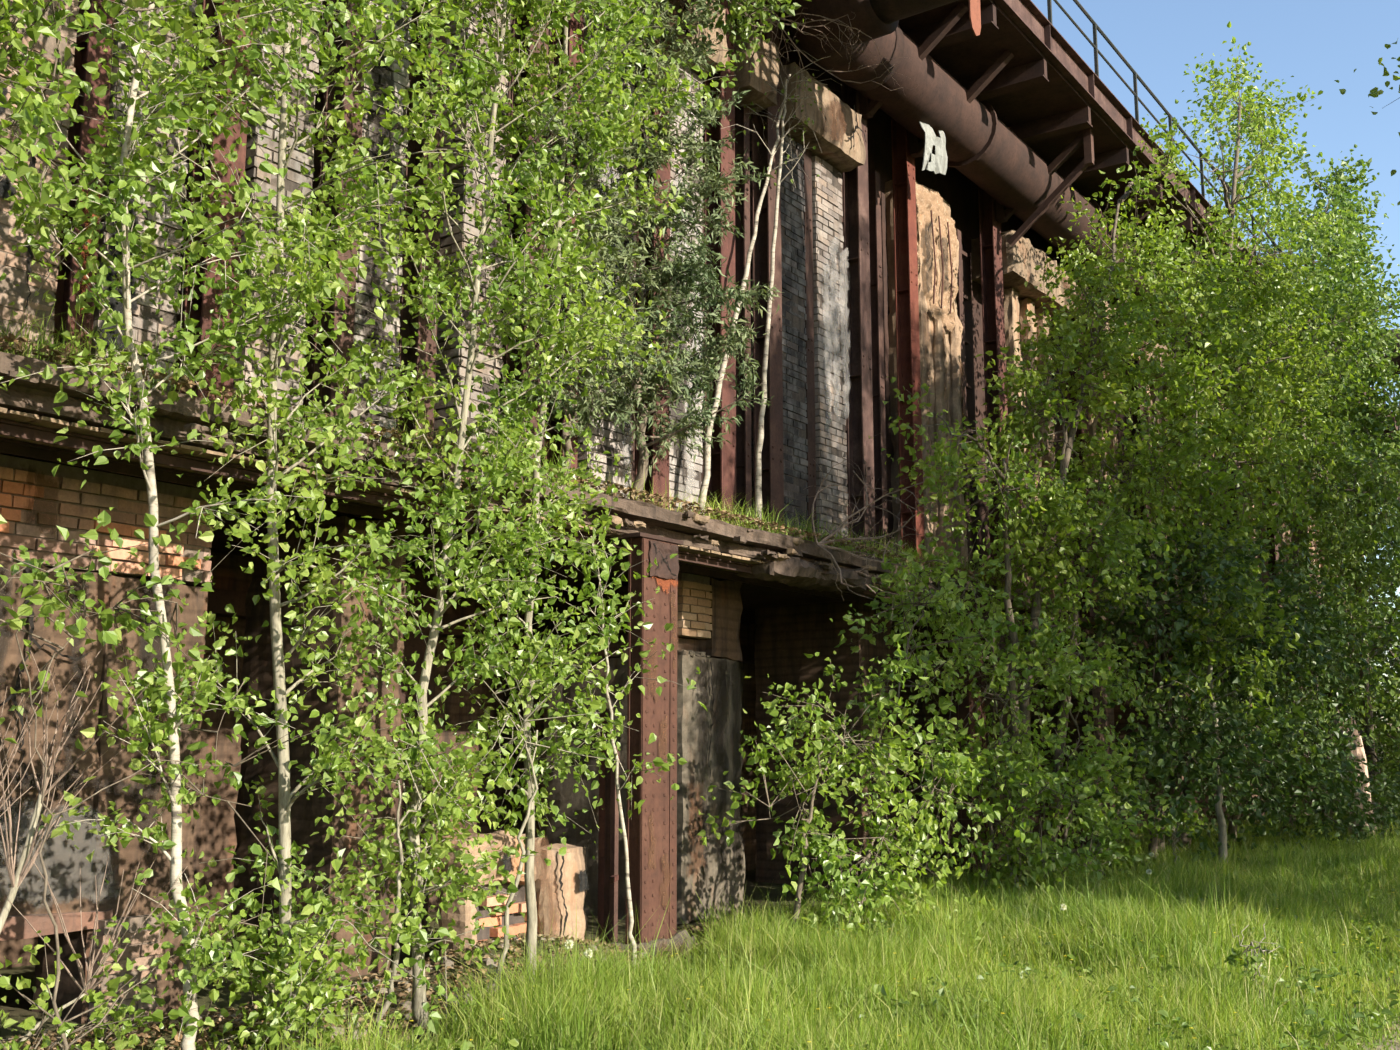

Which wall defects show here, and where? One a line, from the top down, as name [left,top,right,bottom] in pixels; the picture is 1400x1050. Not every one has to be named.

rust [652,576,678,668]
leakage [699,659,744,886]